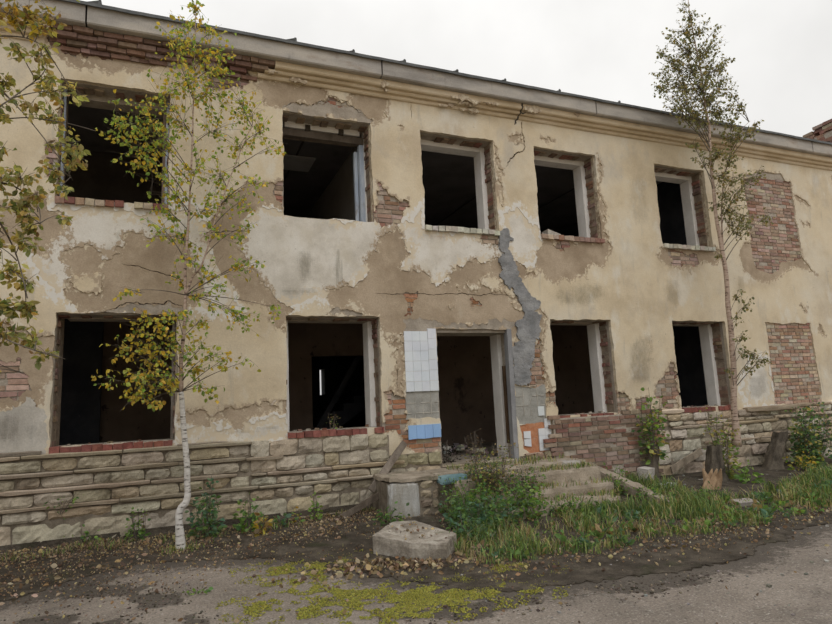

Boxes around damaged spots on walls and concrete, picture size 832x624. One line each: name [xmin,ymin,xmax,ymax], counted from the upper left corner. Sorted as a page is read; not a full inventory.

flaking render [47,23,389,125]
flaking render [0,141,611,453]
flaking render [658,245,721,270]
flaking render [740,172,811,282]